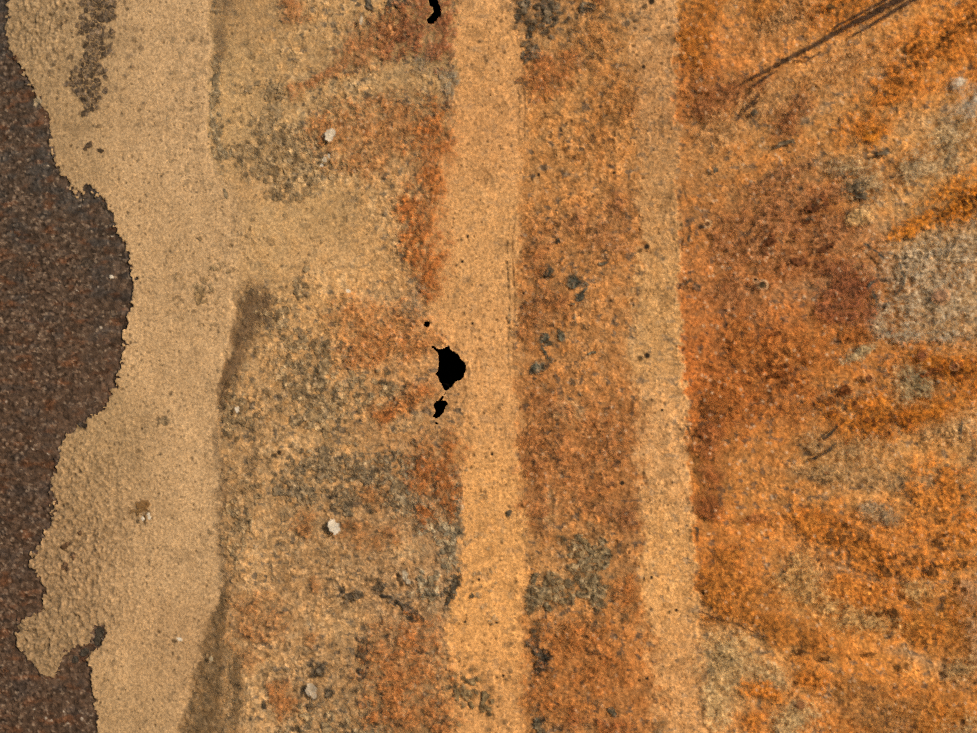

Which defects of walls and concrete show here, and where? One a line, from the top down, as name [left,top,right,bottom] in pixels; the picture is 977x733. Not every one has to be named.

rust [287,0,458,101]
rust [676,0,771,125]
rust [744,0,888,30]
rust [833,0,977,149]
rust [305,93,455,302]
peeling [0,0,138,733]
damp [218,288,271,410]
rust [690,159,977,521]
rust [360,618,460,733]
rust [519,622,631,733]
rust [695,544,835,733]
rust [742,459,977,733]